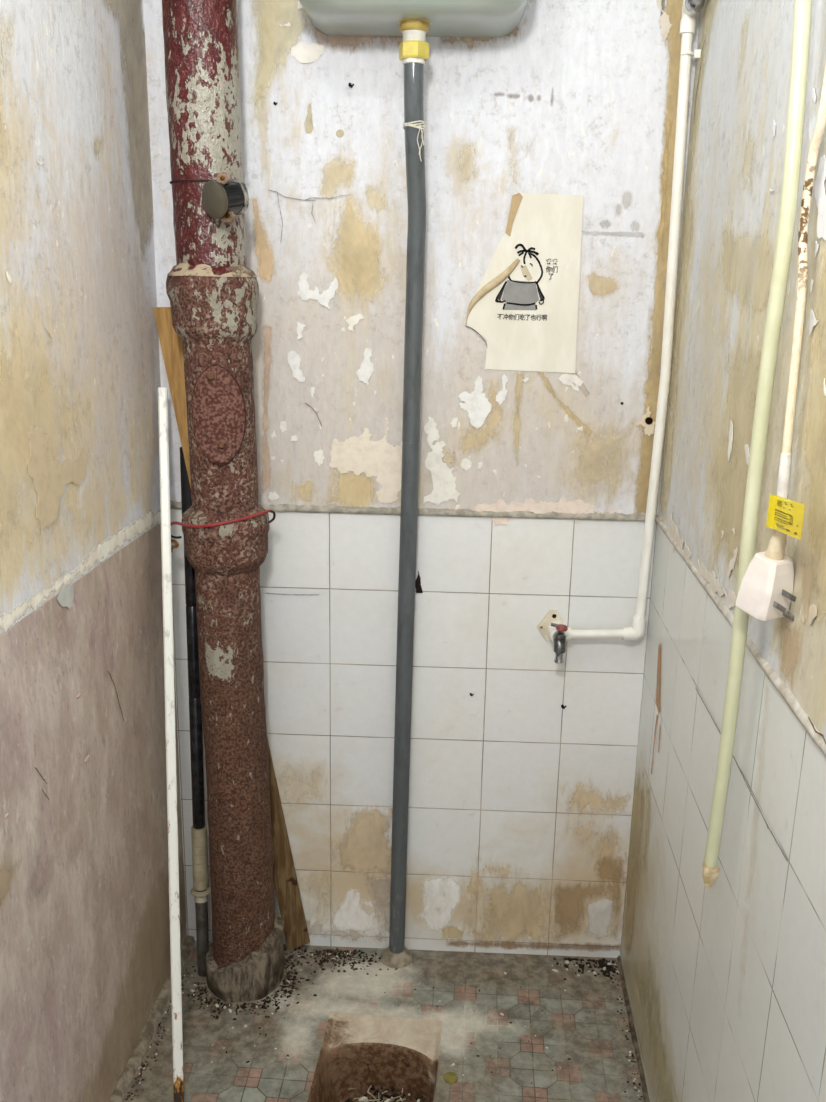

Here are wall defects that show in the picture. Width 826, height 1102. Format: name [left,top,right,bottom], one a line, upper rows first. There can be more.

peeling [814,155,826,257]
peeling [298,272,338,310]
peeling [288,322,315,397]
peeling [313,427,402,504]
peeling [423,417,482,505]
peeling [450,375,508,429]
peeling [634,406,655,436]
peeling [475,496,615,526]
peeling [0,511,161,632]
rust [651,645,661,773]
leakage [340,810,392,939]
leakage [470,837,621,941]